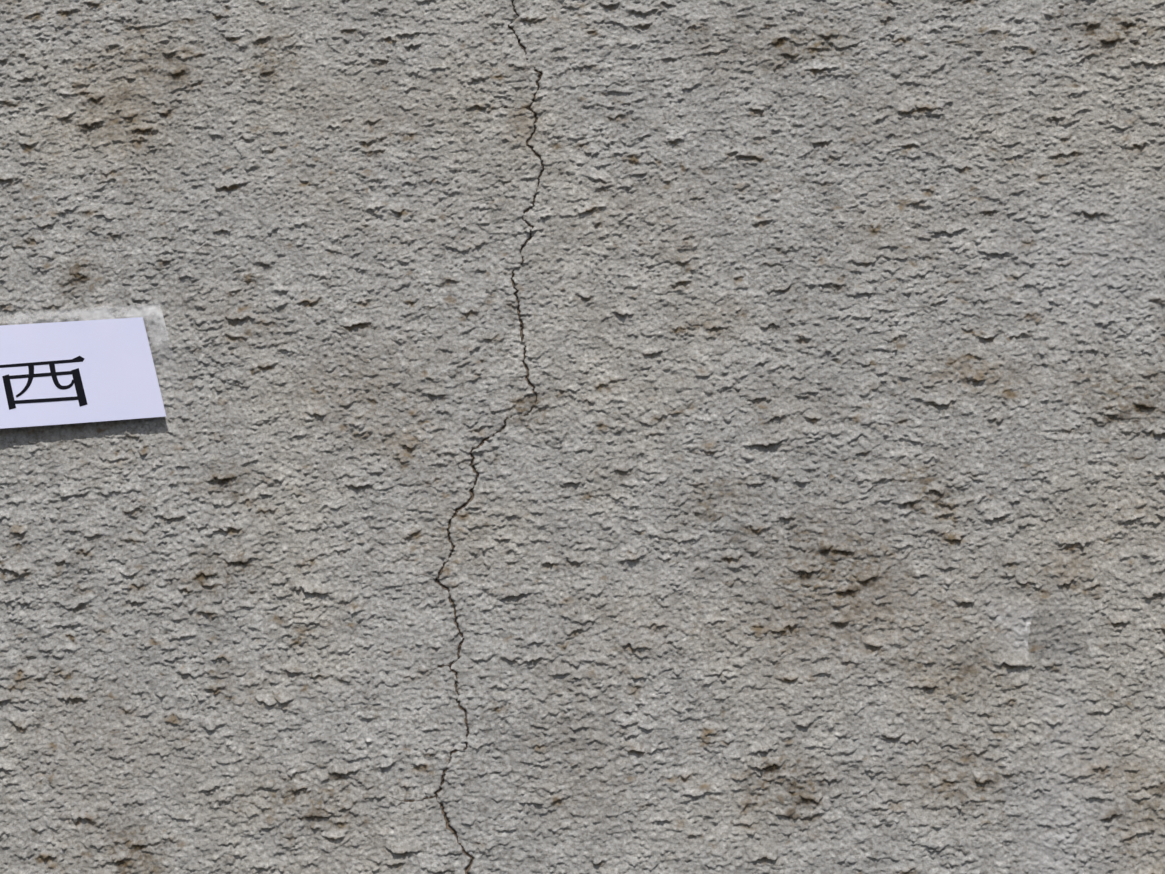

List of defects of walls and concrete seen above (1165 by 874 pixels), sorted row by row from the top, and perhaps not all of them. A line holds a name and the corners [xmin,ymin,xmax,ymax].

crack [394,1,544,874]